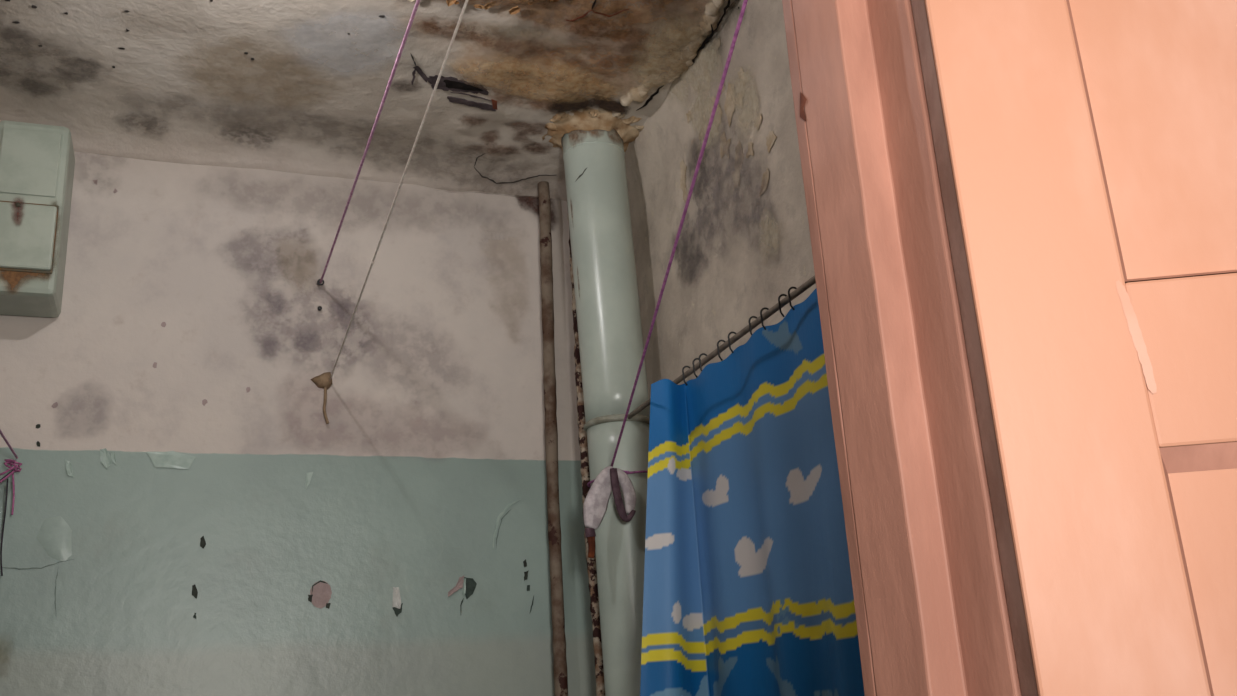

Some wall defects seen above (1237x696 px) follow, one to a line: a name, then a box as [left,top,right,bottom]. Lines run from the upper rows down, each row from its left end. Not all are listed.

flaking render [395,54,497,111]
flaking render [542,93,644,152]
peeling [671,37,777,204]
leakage [676,135,767,275]
peeling [308,580,332,609]
peeling [393,587,403,616]
peeling [448,576,477,612]